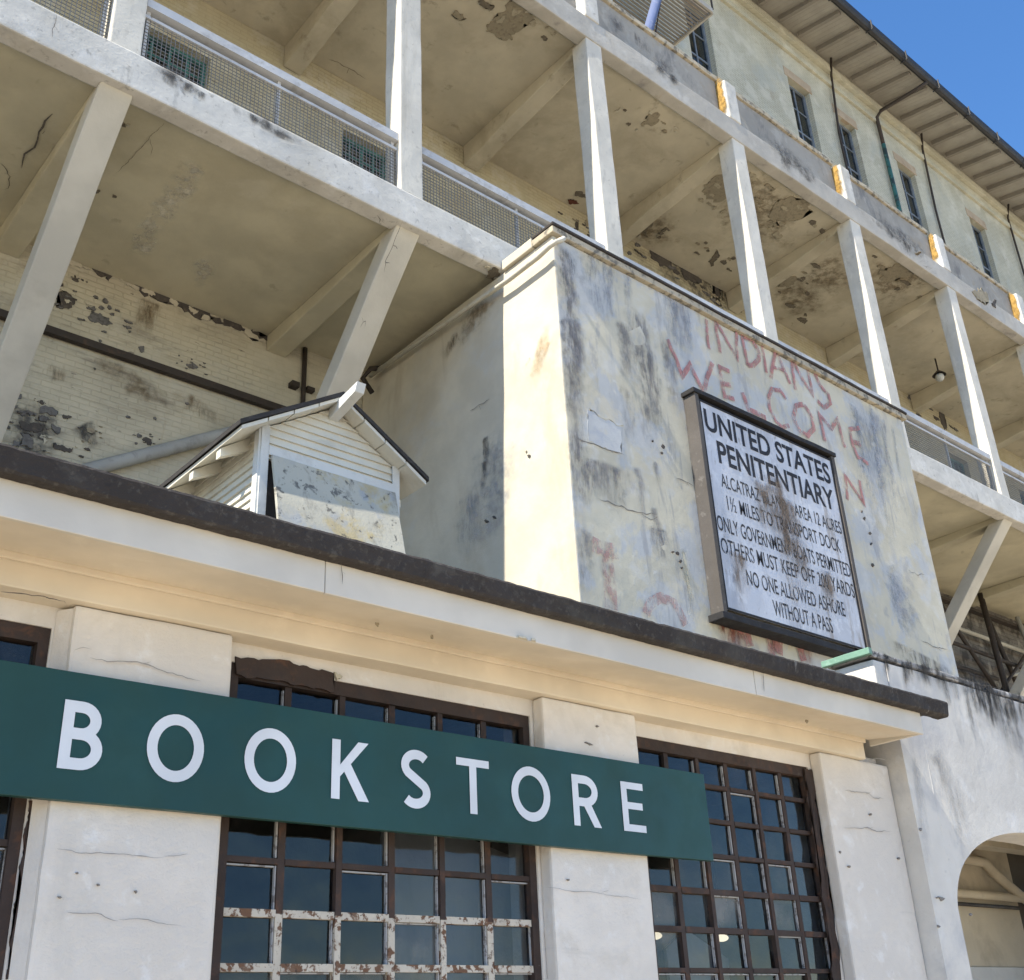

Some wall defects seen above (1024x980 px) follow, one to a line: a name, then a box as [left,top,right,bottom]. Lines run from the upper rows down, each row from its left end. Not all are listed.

peeling [478,0,558,41]
peeling [698,174,727,213]
peeling [749,172,826,239]
peeling [54,260,267,343]
peeling [778,263,821,324]
peeling [872,255,914,291]
leakage [568,298,581,359]
peeling [7,394,103,458]
crack [76,647,199,681]
peeling [235,656,343,693]
leakage [903,660,945,683]